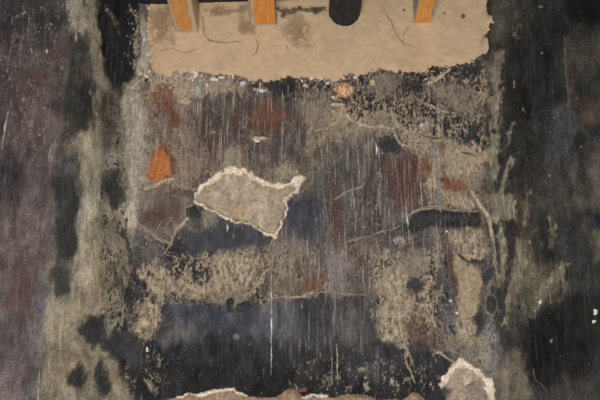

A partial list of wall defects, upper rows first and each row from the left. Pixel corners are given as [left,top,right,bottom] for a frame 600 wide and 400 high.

crack [202,16,259,56]
crack [384,10,415,47]
corrosion [141,143,177,191]
spalling [194,144,305,239]
spalling [169,382,376,400]
spalling [393,392,424,400]
spalling [439,357,495,400]